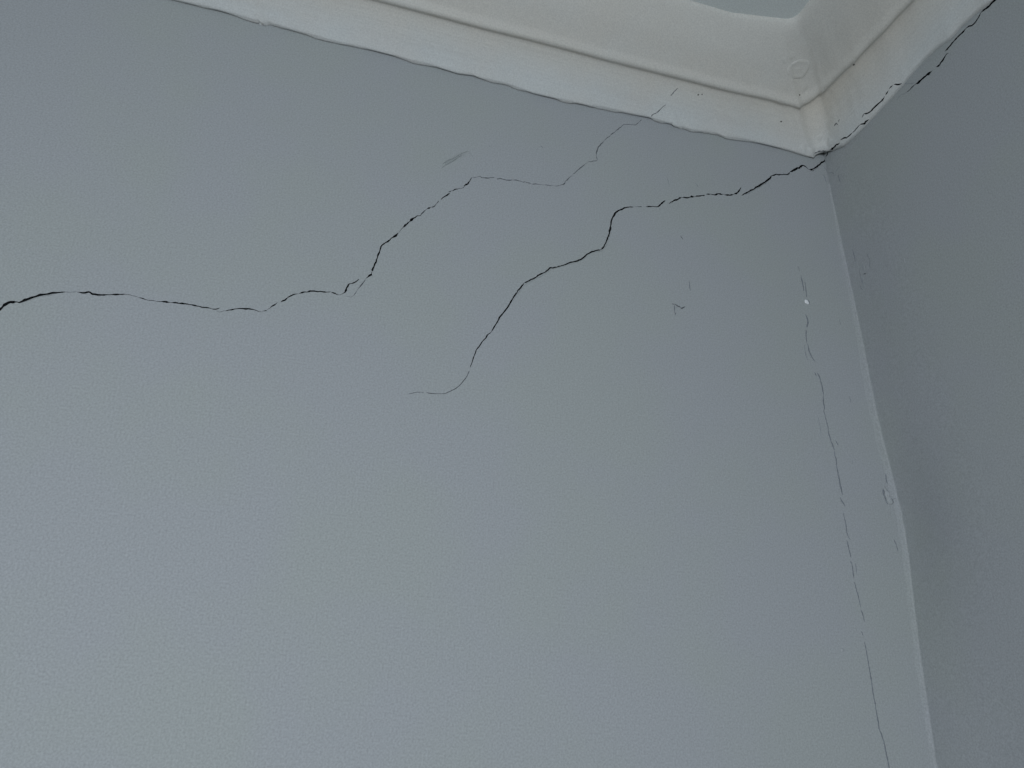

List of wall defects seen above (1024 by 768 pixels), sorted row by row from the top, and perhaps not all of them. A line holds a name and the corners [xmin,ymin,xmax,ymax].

crack [0,88,678,312]
crack [410,0,996,394]
crack [798,267,890,768]